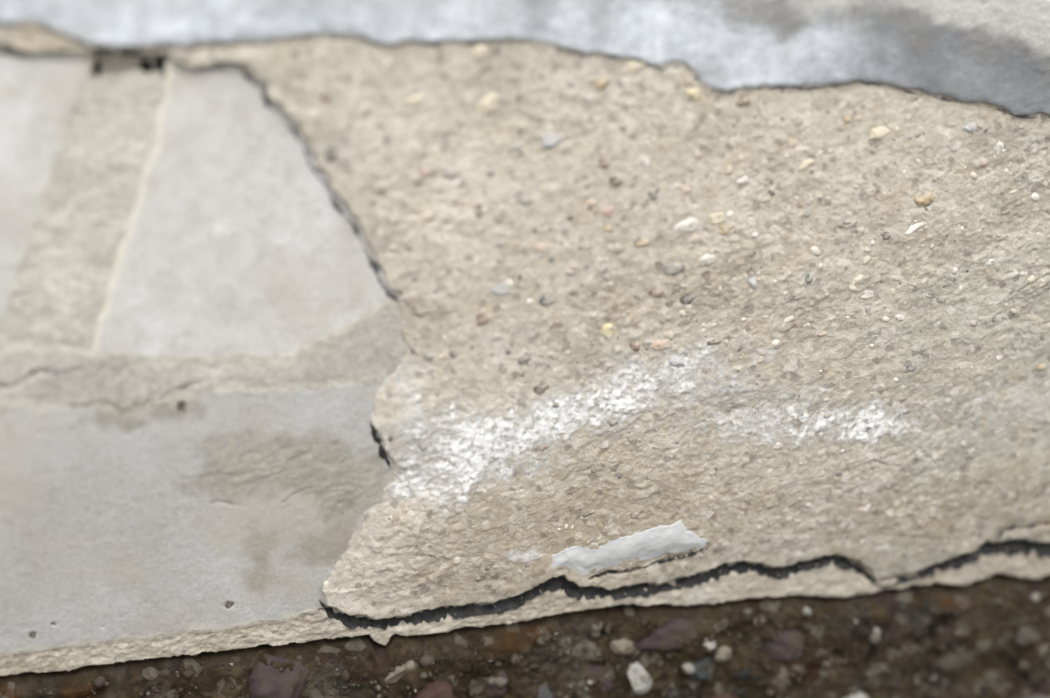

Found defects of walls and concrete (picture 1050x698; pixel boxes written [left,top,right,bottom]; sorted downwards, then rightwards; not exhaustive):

water stain [386,344,909,506]